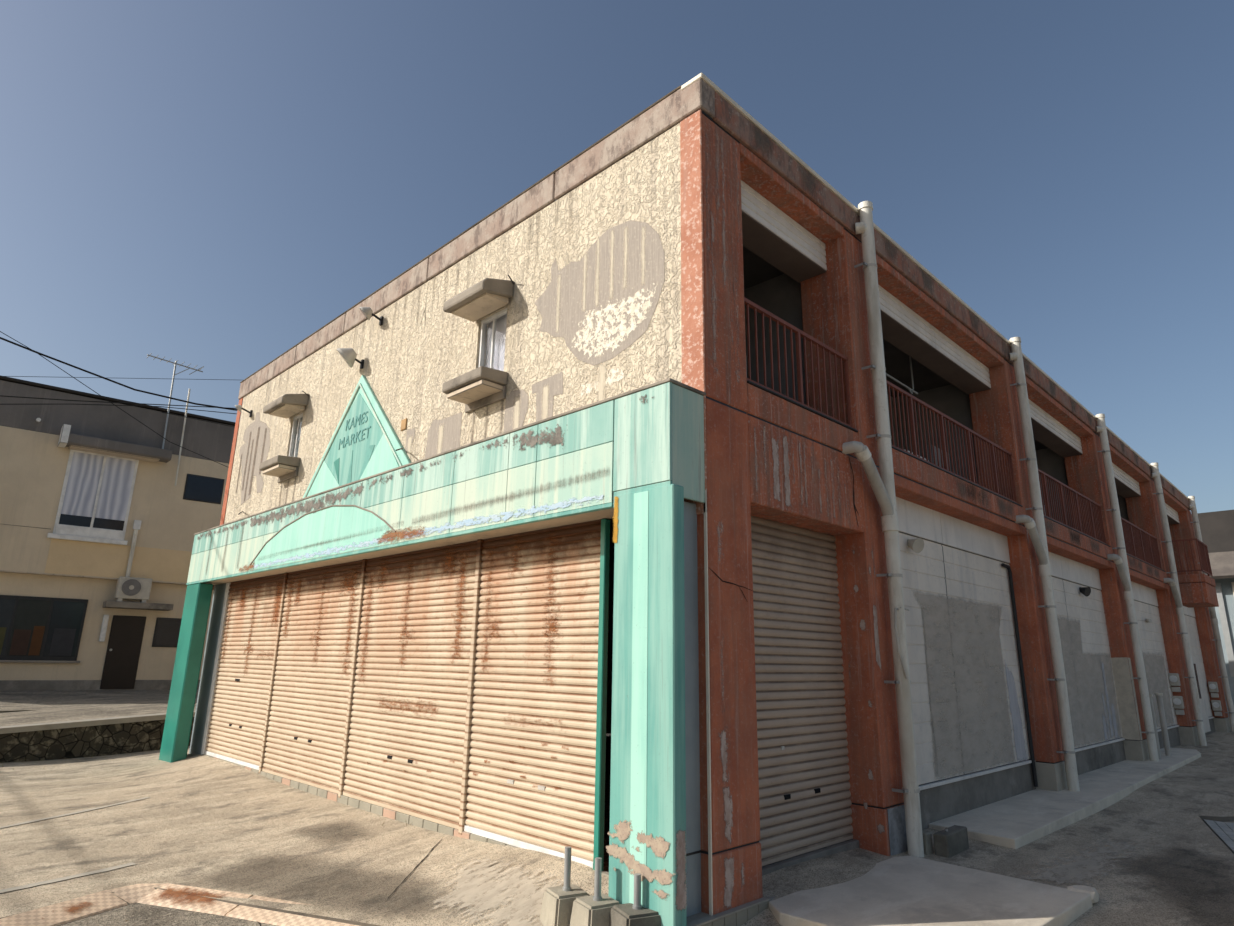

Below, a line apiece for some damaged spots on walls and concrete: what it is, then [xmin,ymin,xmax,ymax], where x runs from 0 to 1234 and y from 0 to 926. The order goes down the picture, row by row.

peeling [535,220,665,401]
peeling [198,372,565,538]
corrosion [222,585,274,671]
corrosion [272,580,302,634]
corrosion [341,566,388,682]
corrosion [377,528,423,544]
corrosion [443,551,468,659]
corrosion [483,551,501,669]
corrosion [542,536,558,681]
crack [711,570,752,599]
peeling [606,820,687,910]